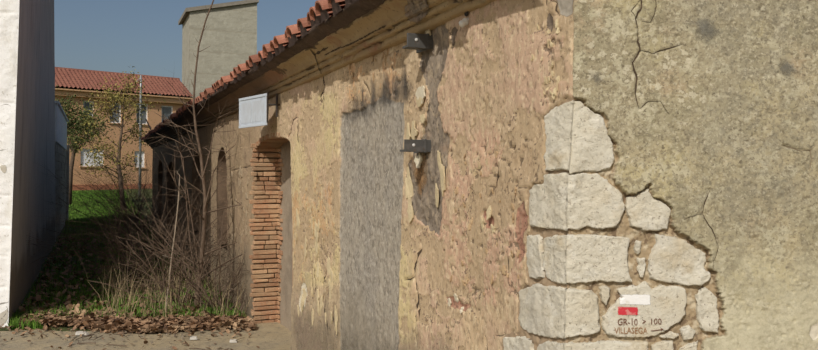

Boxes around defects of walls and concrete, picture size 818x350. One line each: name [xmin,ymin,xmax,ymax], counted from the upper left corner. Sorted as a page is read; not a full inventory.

flaking render [405,24,465,235]
flaking render [468,188,501,233]
flaking render [490,54,719,350]
crack [631,0,681,111]